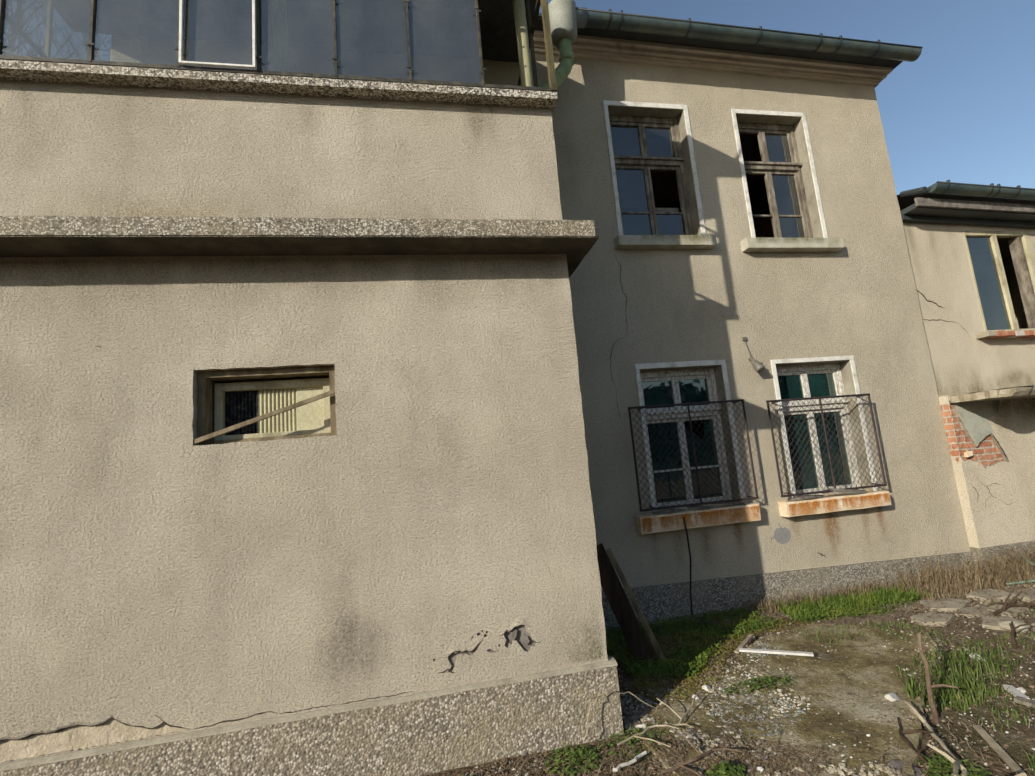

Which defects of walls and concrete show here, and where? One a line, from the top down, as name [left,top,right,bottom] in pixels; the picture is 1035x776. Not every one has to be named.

crack [917,290,968,334]
flaking render [940,400,1009,466]
corrosion [792,493,889,536]
flaking render [433,625,540,674]
crack [195,691,414,729]
flaking render [0,715,189,762]